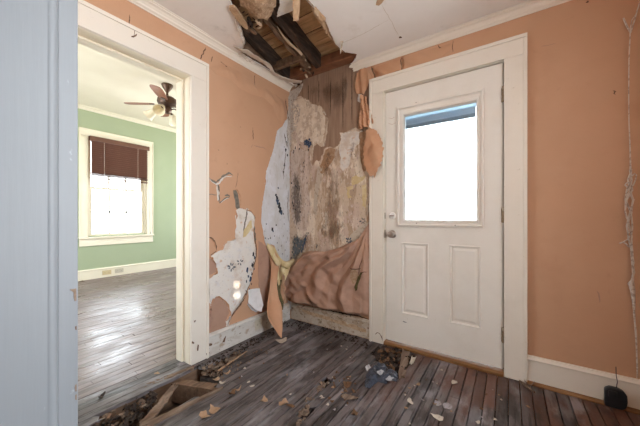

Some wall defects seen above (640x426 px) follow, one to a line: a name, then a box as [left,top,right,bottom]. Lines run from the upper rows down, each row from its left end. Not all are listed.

spalling [277,0,293,17]
damp [291,162,305,225]